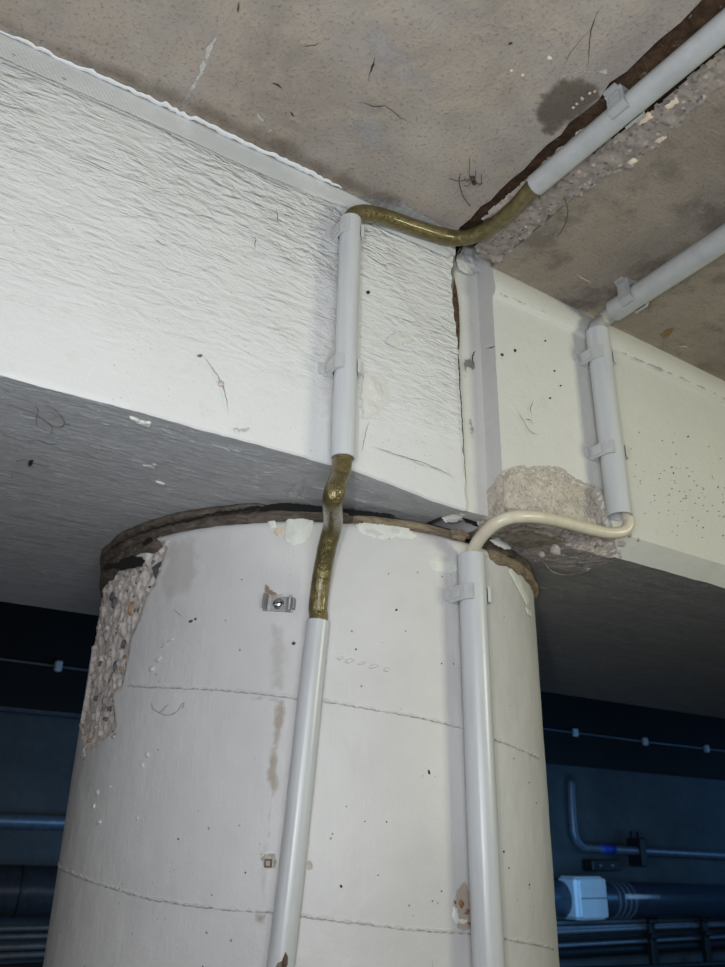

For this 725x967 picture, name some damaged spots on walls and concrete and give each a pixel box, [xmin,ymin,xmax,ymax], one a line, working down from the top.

crack [564,9,599,66]
water stain [538,69,608,133]
spalling [475,49,725,266]
crack [105,505,263,555]
spalling [468,465,640,572]
spalling [79,536,170,761]